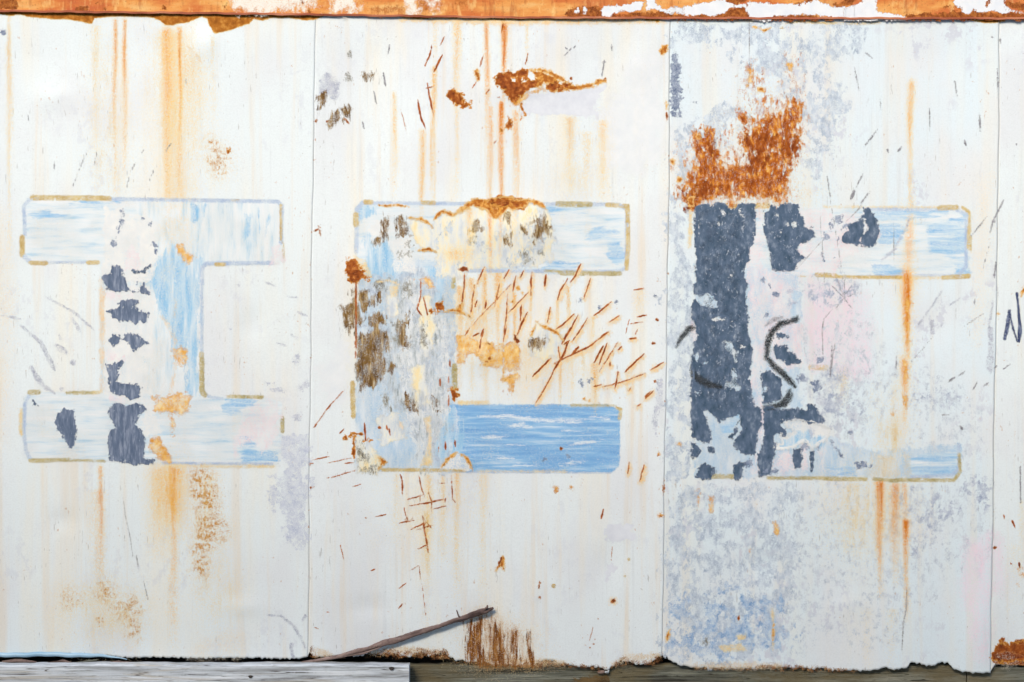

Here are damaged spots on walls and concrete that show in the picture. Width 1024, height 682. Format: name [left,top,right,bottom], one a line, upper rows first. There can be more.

rust [85,463,109,647]
rust [73,2,239,287]
rust [136,299,250,649]
peeling [342,220,474,476]
peeling [378,203,467,229]
rust [344,0,614,415]
rust [364,391,671,681]
peeling [398,0,1024,670]
rust [662,52,833,226]
rust [798,78,938,666]
rust [941,0,1024,17]
rust [991,638,1024,671]